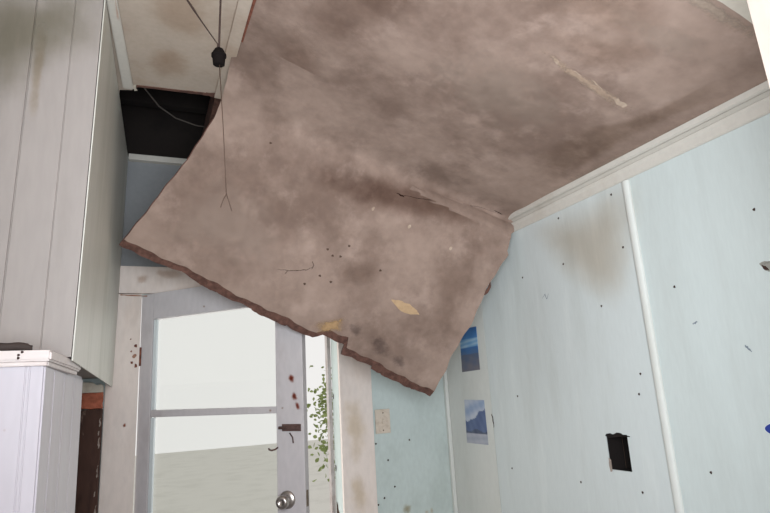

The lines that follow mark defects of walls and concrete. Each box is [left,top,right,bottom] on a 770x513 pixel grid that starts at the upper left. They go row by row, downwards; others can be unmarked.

peeling [691,0,753,29]
spalling [605,433,632,472]